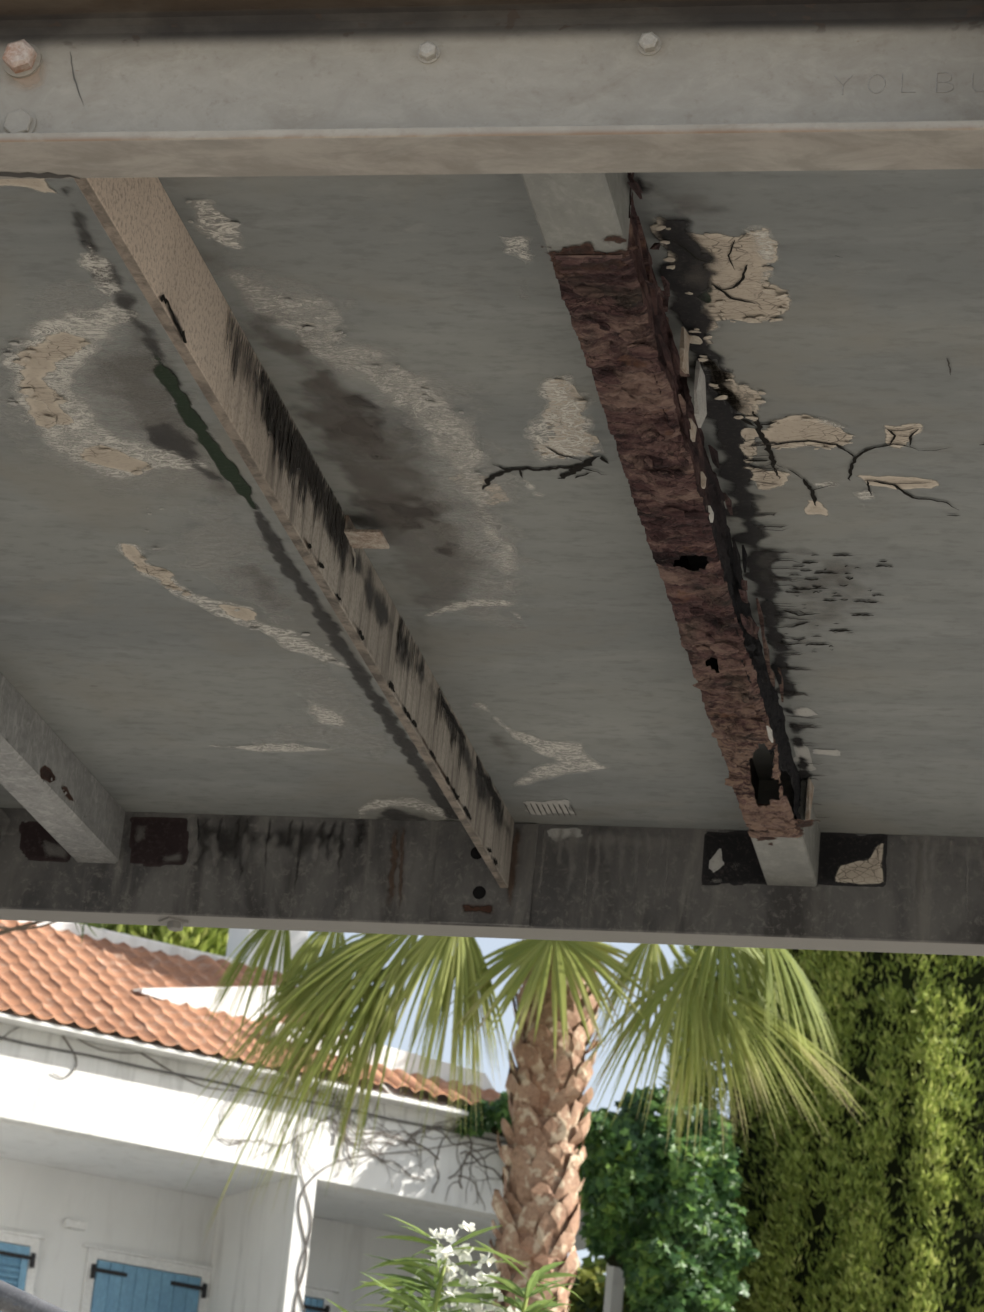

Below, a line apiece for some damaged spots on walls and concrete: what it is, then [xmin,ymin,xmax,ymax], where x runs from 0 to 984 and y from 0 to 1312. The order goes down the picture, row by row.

peeling [2,302,207,477]
damp [225,312,425,681]
damp [229,273,516,572]
crack [449,447,609,505]
peeling [526,375,600,461]
corrosion [541,173,819,845]
spalling [650,217,854,490]
damp [657,219,885,780]
crack [741,411,960,516]
damp [436,691,509,831]
peeling [702,831,768,885]
peeling [818,832,888,887]